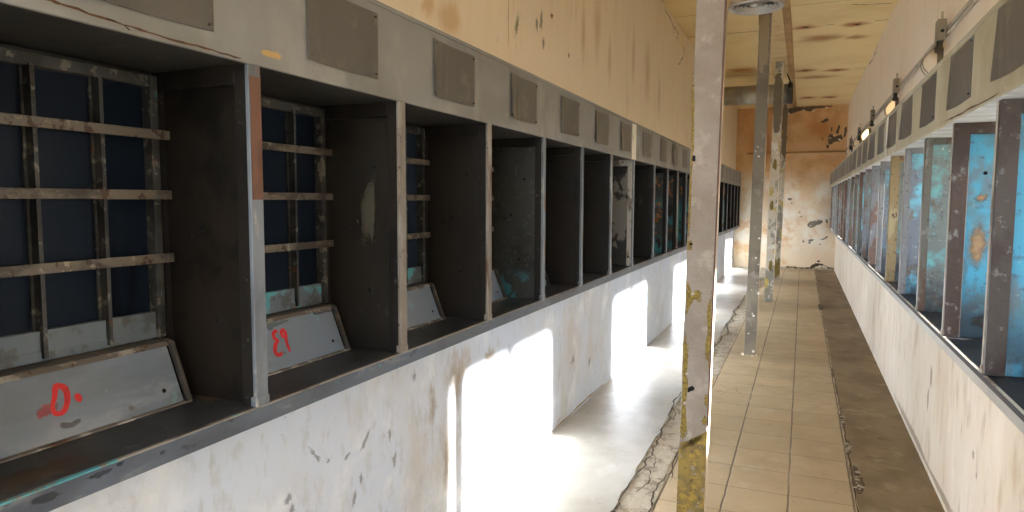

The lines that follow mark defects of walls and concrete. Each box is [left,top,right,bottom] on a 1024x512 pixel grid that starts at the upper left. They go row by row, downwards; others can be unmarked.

crack [47,0,242,59]
leakage [534,5,545,53]
leakage [792,31,878,44]
peeling [773,70,847,170]
peeling [755,257,780,277]
peeling [685,282,712,366]
crack [713,306,739,353]
leakage [426,338,498,503]
crack [610,392,681,512]
peeling [676,333,708,512]